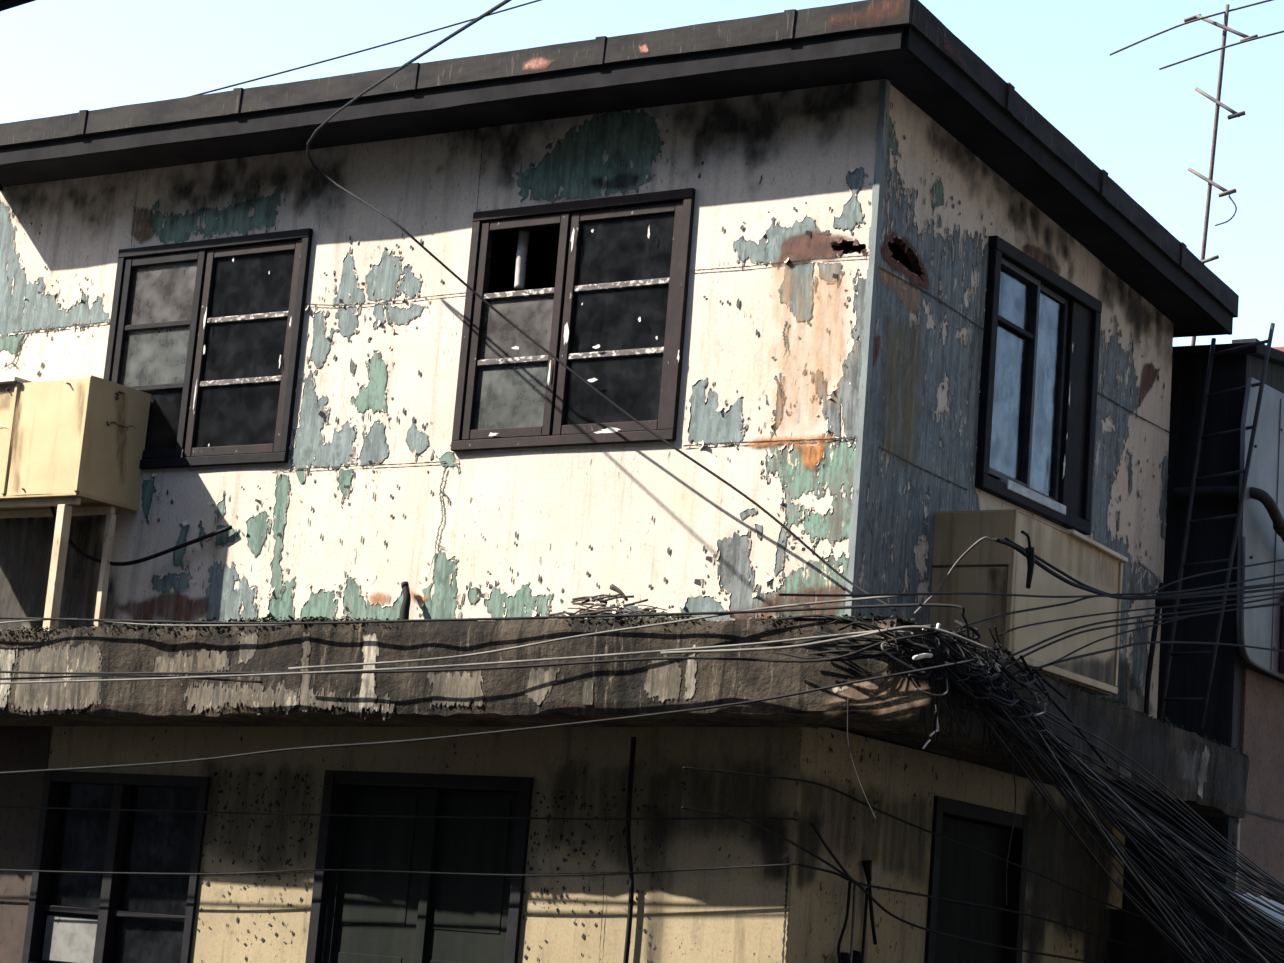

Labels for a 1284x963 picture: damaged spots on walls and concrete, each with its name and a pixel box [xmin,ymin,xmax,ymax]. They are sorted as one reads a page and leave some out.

damp [171,158,341,217]
damp [446,120,541,183]
peeling [512,108,669,212]
damp [676,82,858,162]
peeling [0,202,109,376]
rust [778,231,929,308]
peeling [586,102,992,625]
rust [1140,363,1160,404]
peeling [139,233,564,720]
rust [749,435,834,468]
peeling [1088,314,1168,706]
damp [649,765,925,887]